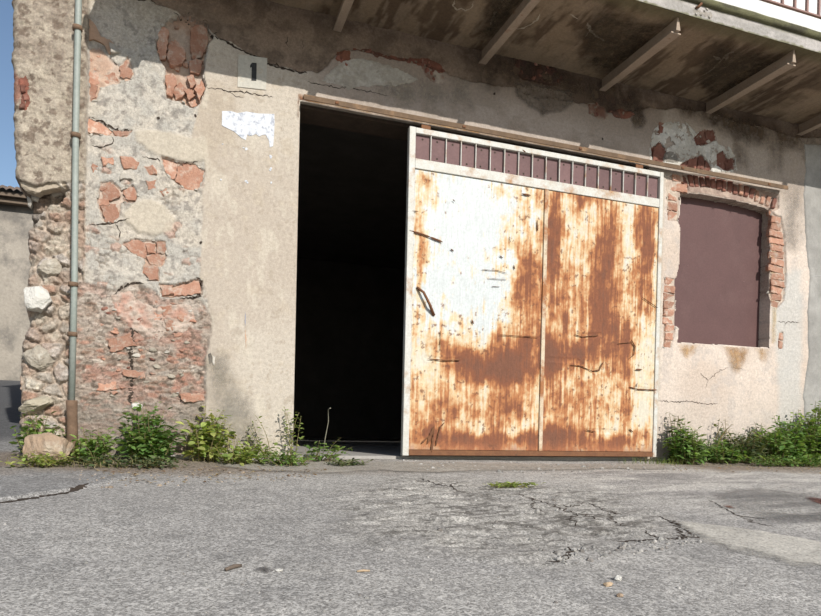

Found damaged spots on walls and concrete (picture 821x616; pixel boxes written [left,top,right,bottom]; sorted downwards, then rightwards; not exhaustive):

spalling [155,16,212,117]
flaking render [323,48,445,90]
water stain [585,14,660,71]
peeling [91,156,114,173]
spalling [96,173,139,223]
spalling [144,157,205,196]
flaking render [650,122,787,308]
spalling [97,239,203,397]